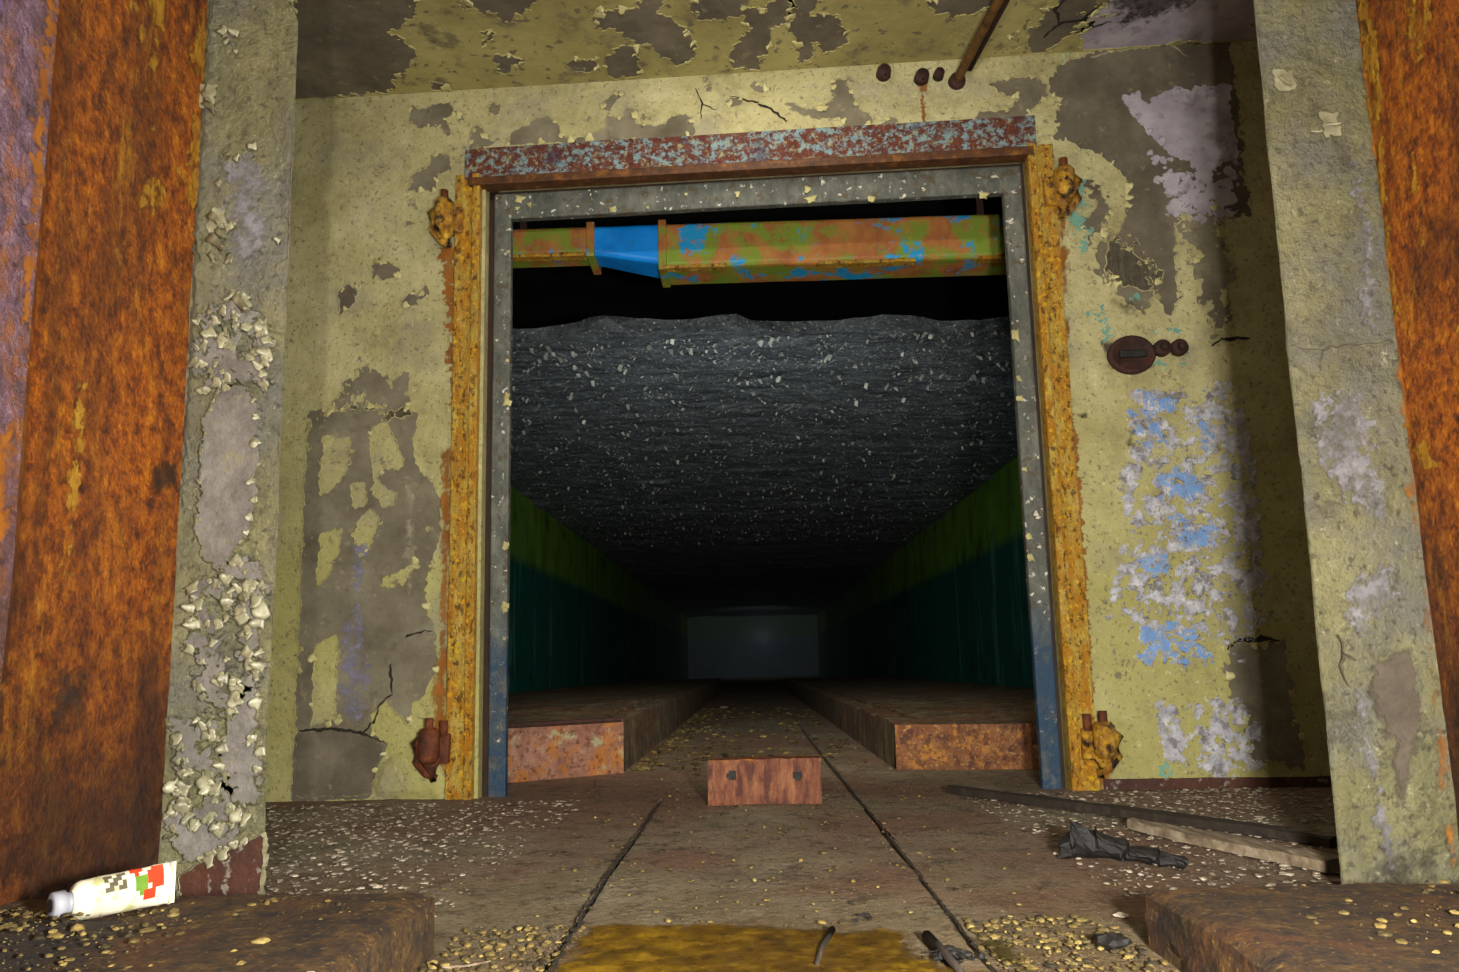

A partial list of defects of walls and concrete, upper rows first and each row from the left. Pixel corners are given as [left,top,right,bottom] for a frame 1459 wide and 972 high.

corrosion [21,0,62,329]
corrosion [136,12,207,214]
peeling [286,0,422,100]
peeling [974,0,1257,346]
corrosion [1357,0,1388,204]
corrosion [59,383,87,581]
peeling [162,141,282,898]
peeling [289,355,444,801]
corrosion [432,449,451,732]
corrosion [437,247,454,405]
peeling [967,377,1341,896]
peeling [1310,390,1385,519]